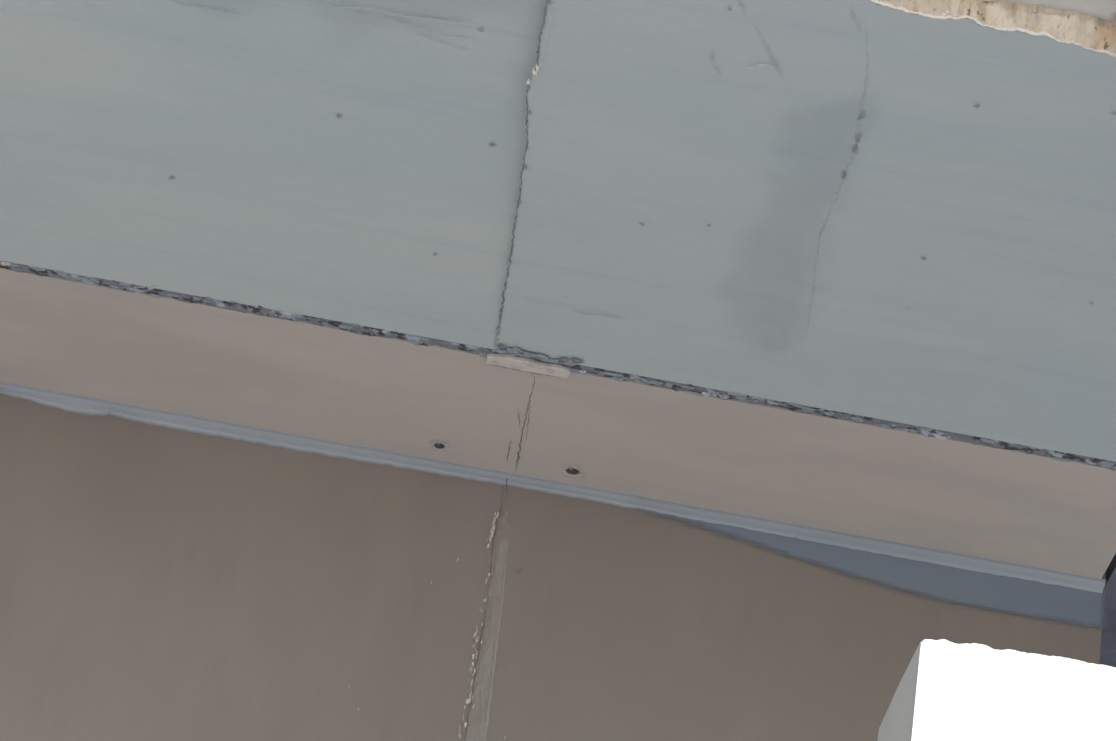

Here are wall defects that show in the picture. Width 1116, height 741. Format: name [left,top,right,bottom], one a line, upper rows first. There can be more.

spalling [869,0,1116,58]
crack [0,0,1116,471]
crack [458,381,535,738]